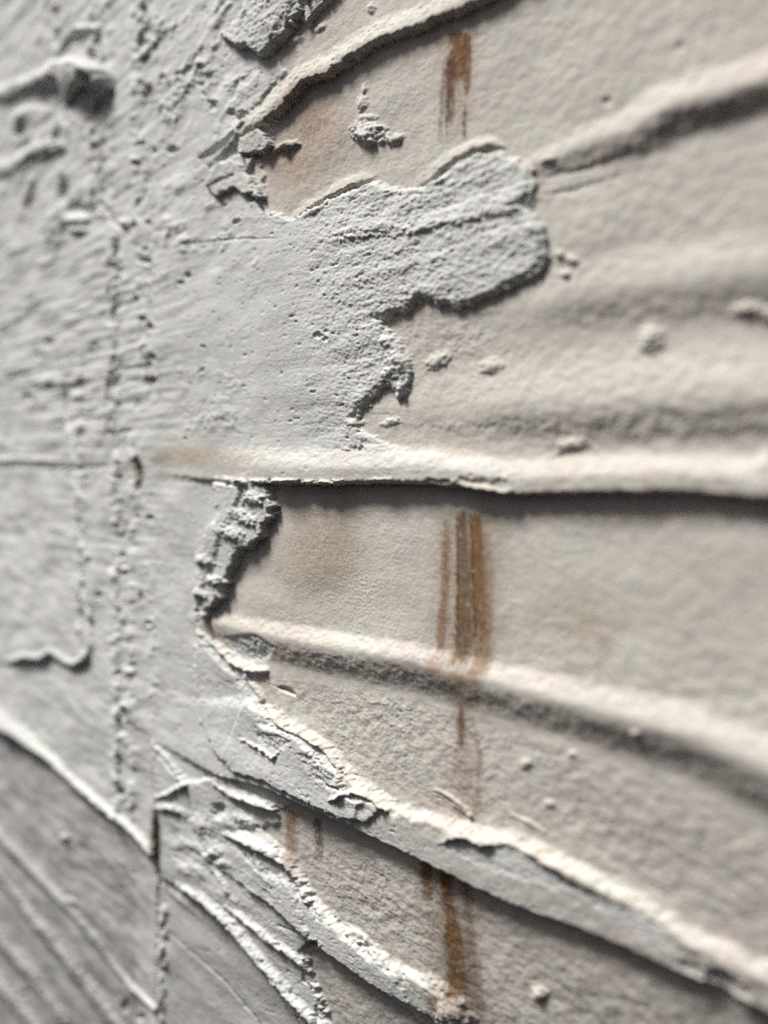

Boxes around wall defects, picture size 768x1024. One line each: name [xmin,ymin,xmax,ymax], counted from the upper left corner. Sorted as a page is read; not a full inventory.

flaking render [295,0,335,28]
hole [205,97,219,114]
rust [445,33,471,134]
flaking render [138,107,555,454]
rust [438,512,489,673]
flaking render [149,476,391,1024]
rust [422,862,476,996]
flaking render [438,825,686,953]